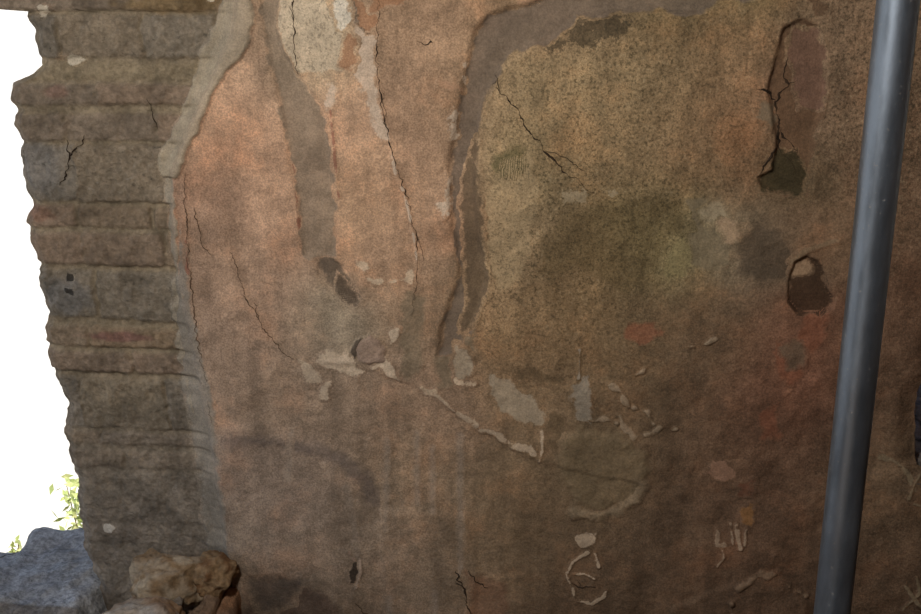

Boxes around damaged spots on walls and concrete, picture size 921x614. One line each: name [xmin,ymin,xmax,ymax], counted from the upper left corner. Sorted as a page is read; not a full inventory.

crack [60,136,84,183]
flaking render [257,0,419,309]
crack [375,3,424,310]
crack [492,75,593,193]
flaking render [433,0,764,357]
spalling [751,14,831,200]
crack [183,178,292,385]
spalling [785,236,844,318]
peeling [296,325,403,403]
peeling [418,384,545,463]
crack [455,571,488,614]
peeling [563,530,609,606]